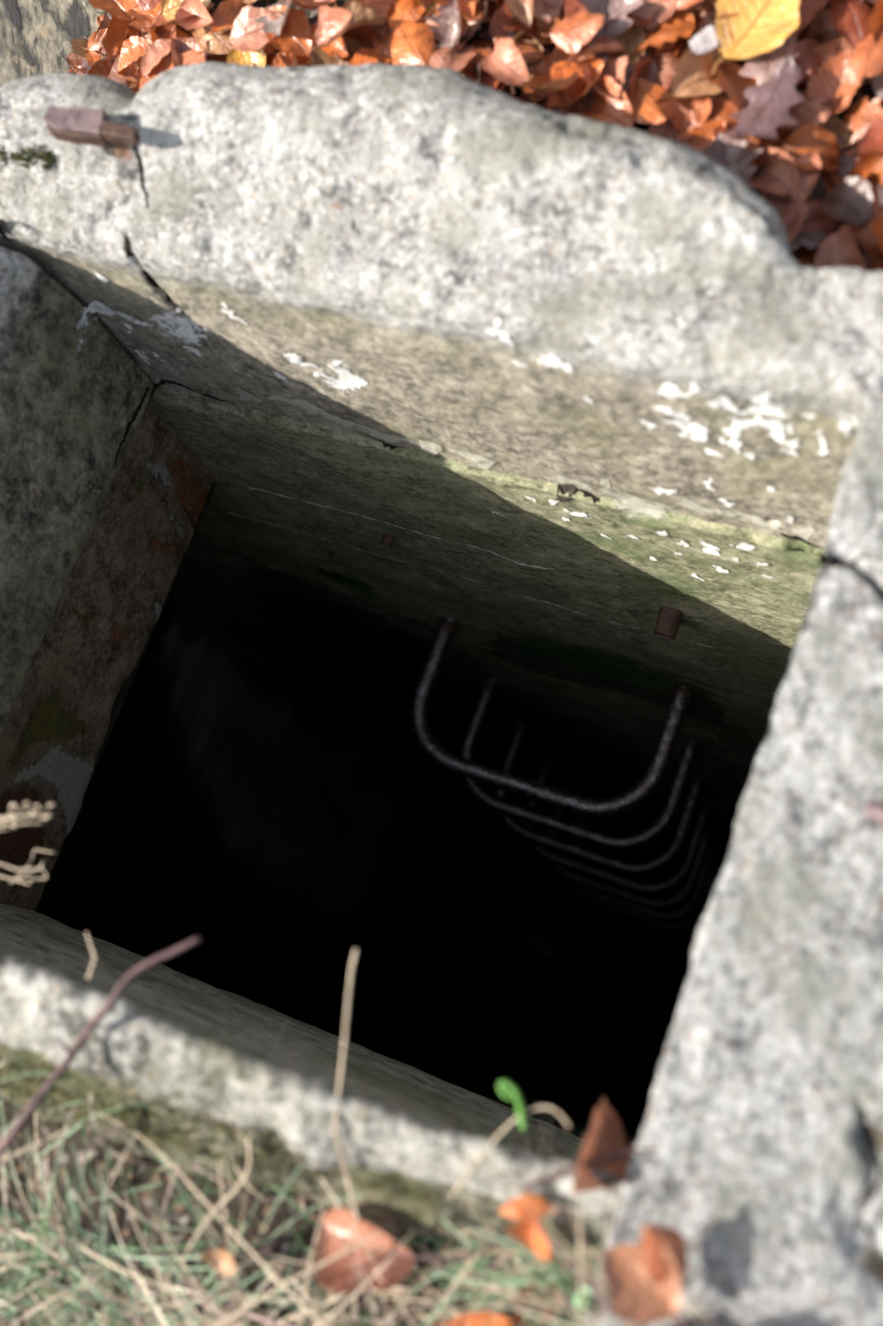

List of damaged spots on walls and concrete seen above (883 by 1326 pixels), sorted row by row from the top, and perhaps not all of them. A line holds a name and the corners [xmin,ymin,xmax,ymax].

crack [132,144,148,209]
crack [122,234,296,396]
crack [112,380,236,469]
crack [358,432,404,451]
crack [550,480,600,503]